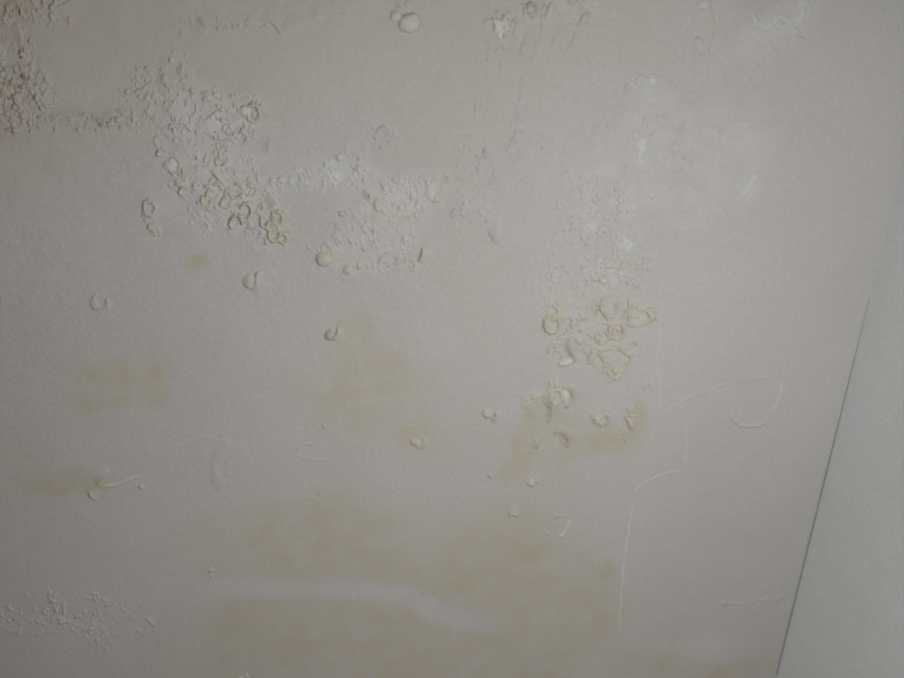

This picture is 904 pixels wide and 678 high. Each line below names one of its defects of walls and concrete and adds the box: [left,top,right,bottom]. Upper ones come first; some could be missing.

flaking render [0,30,66,140]
damp [122,468,779,678]